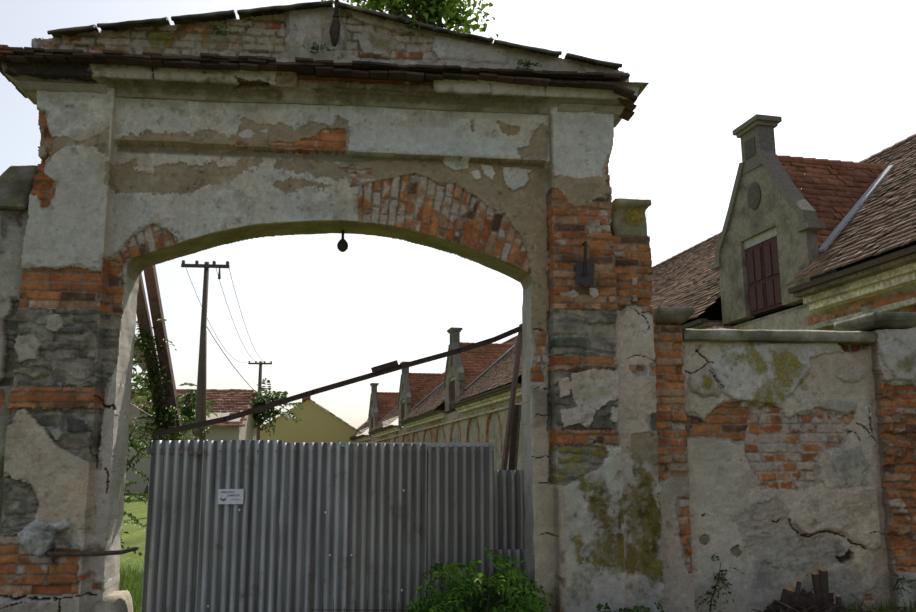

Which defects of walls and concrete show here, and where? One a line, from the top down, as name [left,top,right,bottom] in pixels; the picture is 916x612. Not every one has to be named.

flaking render [0,223,179,467]
spalling [30,109,857,588]
spalling [839,344,870,353]
spalling [0,476,102,596]
crack [772,518,884,549]
spalling [880,383,916,573]
crack [4,592,92,611]